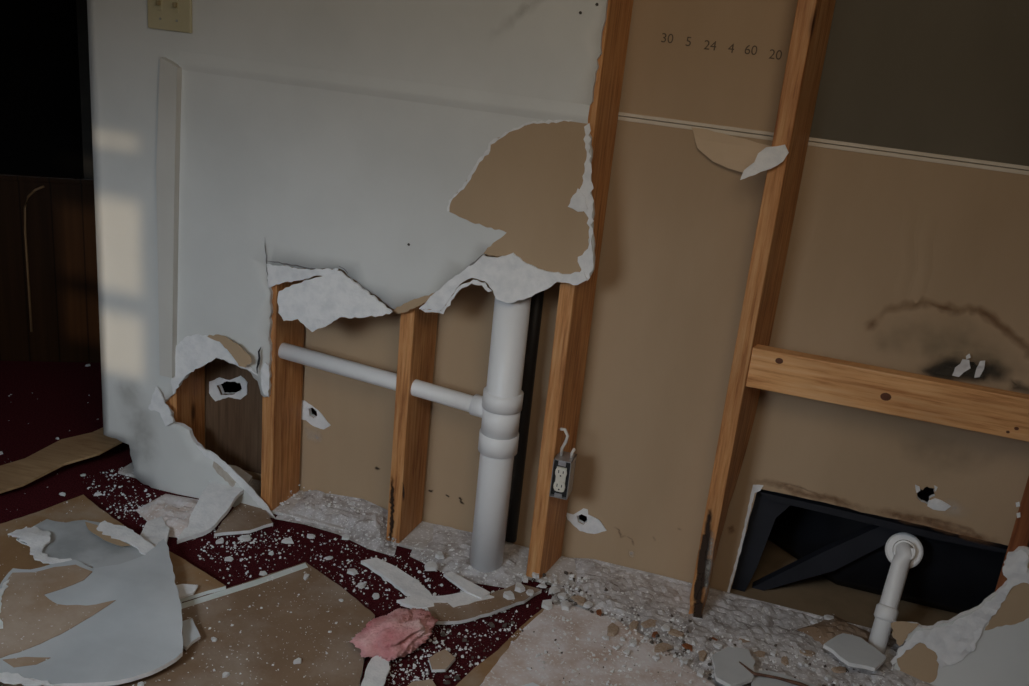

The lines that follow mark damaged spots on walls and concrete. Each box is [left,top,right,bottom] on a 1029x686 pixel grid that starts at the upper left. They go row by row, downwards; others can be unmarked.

spalling [148,334,270,426]
water stain [925,360,1002,379]
spalling [195,443,275,518]